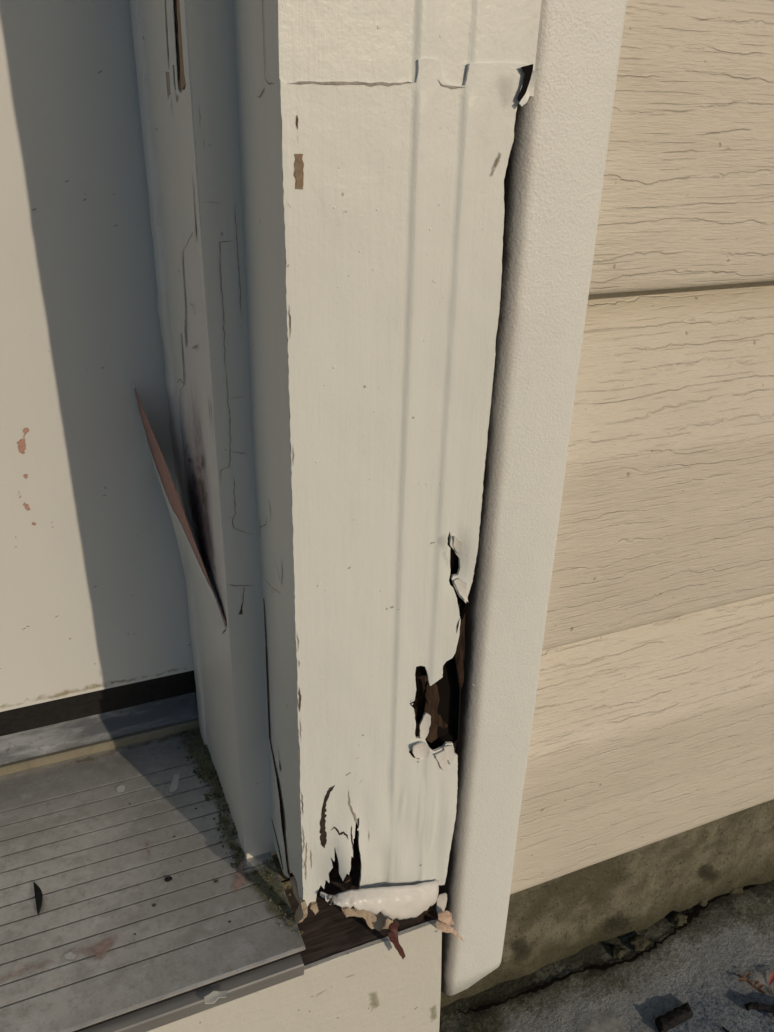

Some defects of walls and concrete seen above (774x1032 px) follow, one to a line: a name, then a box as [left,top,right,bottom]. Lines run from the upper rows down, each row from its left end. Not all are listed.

spalling [164,0,186,109]
crack [258,0,413,97]
crack [178,179,271,535]
peeling [131,377,227,634]
mould [185,440,215,577]
spalling [447,535,468,623]
crack [227,559,370,879]
spalling [410,654,461,766]
peeling [320,880,447,931]
crack [457,879,774,1015]